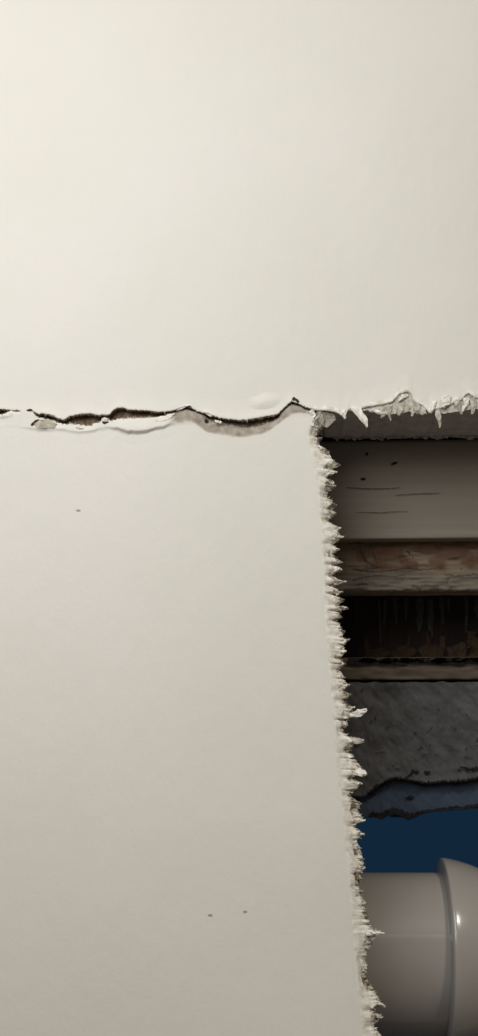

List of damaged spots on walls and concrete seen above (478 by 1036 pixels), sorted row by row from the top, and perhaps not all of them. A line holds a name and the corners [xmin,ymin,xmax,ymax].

crack [0,381,324,448]
spalling [369,795,478,820]